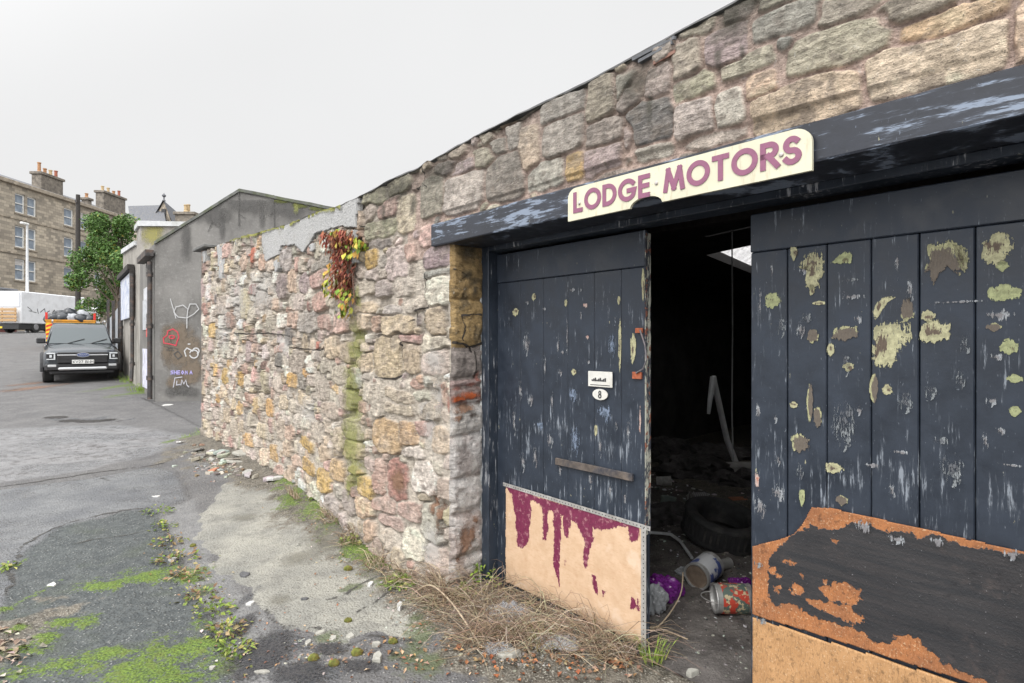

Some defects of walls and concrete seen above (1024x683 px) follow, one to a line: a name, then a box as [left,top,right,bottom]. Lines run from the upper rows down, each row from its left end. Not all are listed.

flaking render [262,198,363,272]
peeling [758,267,782,309]
crack [452,313,482,375]
peeling [778,231,1022,414]
peeling [790,384,861,452]
peeling [755,472,784,521]
peeling [791,433,810,507]
peeling [826,463,844,474]
peeling [942,456,964,488]